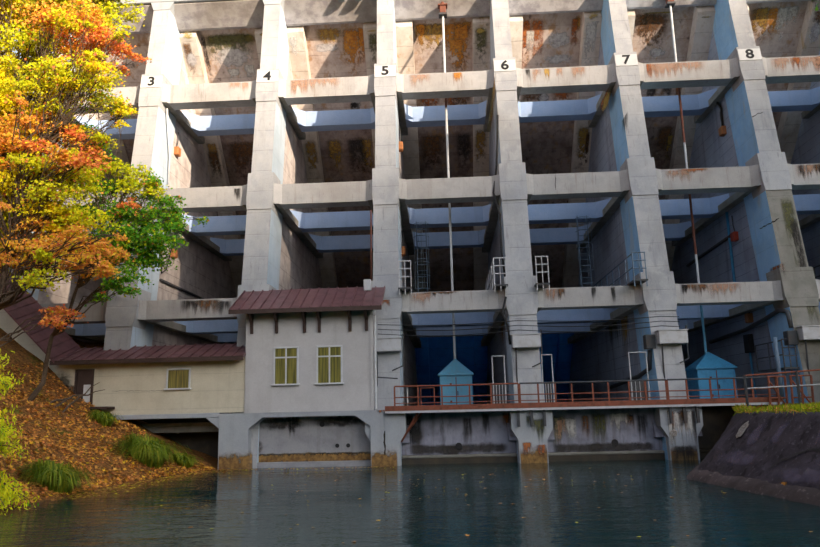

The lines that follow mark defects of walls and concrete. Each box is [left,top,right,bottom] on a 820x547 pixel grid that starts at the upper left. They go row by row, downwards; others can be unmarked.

damp [183,34,255,78]
corrosion [416,22,471,79]
corrosion [646,62,701,73]
corrosion [774,56,820,68]
corrosion [293,79,336,90]
damp [782,200,806,267]
damp [267,417,299,433]
damp [318,417,361,426]
damp [407,416,505,455]
damp [527,416,544,437]
damp [553,413,652,452]
corrosion [521,442,548,463]